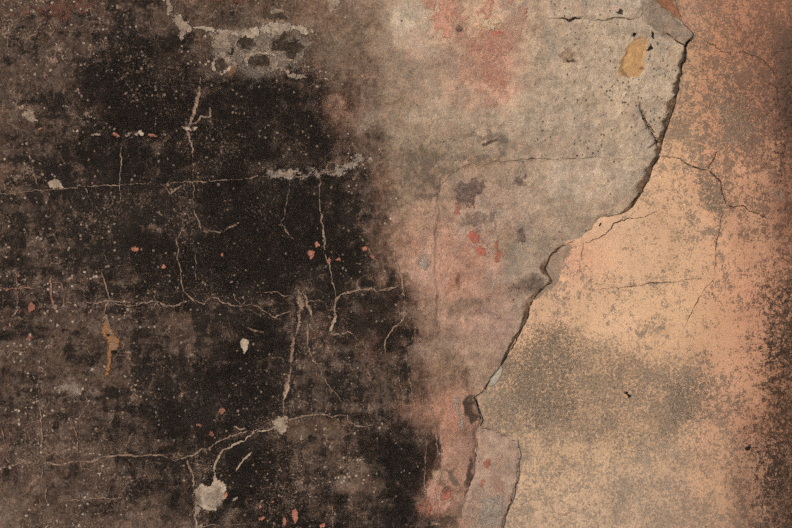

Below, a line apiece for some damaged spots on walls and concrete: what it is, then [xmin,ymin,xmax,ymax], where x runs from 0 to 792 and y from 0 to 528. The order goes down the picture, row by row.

spalling [166,0,319,79]
crack [552,11,643,22]
flaking render [618,0,692,78]
efflorescence [267,154,363,180]
crack [502,22,792,364]
crack [0,78,415,502]
corrosion [102,313,119,375]
spalling [194,473,238,528]
flaking render [458,427,519,528]
crack [463,382,515,499]
water stain [666,374,712,429]
mould [746,270,792,528]